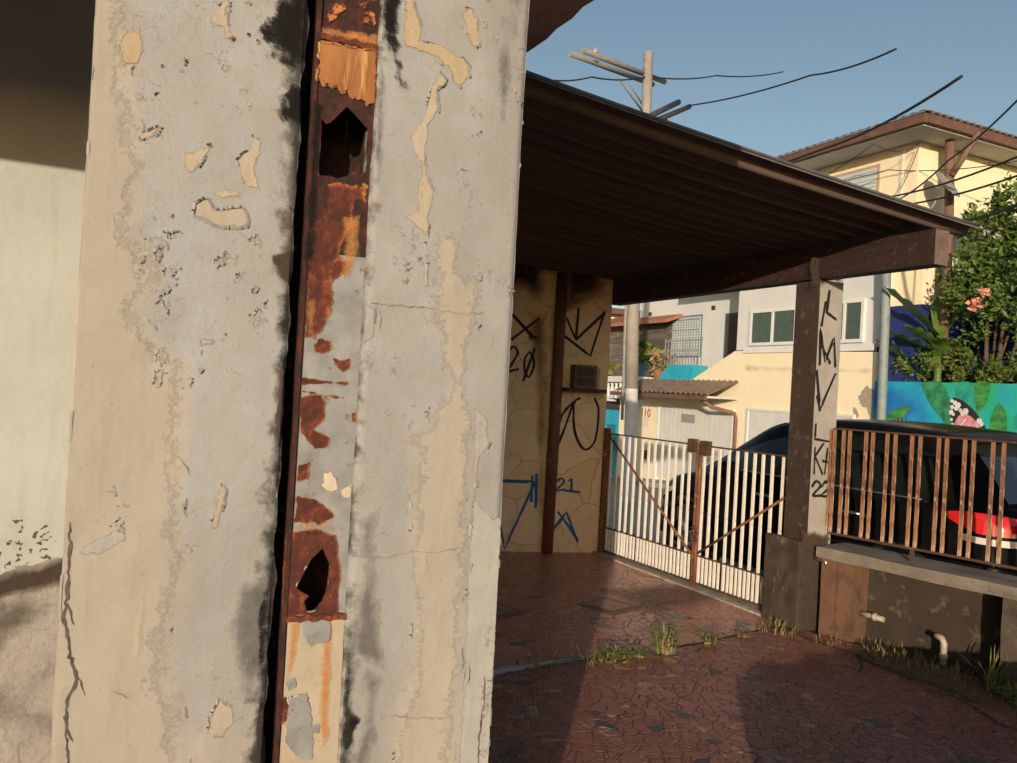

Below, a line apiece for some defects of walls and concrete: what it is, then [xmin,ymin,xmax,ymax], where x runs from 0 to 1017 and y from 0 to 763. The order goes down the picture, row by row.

water stain [259,0,305,70]
corrosion [324,0,376,44]
water stain [383,0,406,87]
water stain [276,83,300,145]
peeling [191,134,261,256]
corrosion [299,182,369,449]
peeling [0,0,205,763]
peeling [392,0,501,763]
corrosion [297,462,310,482]
water stain [0,560,63,597]
crack [61,522,85,763]
corrosion [281,496,341,668]